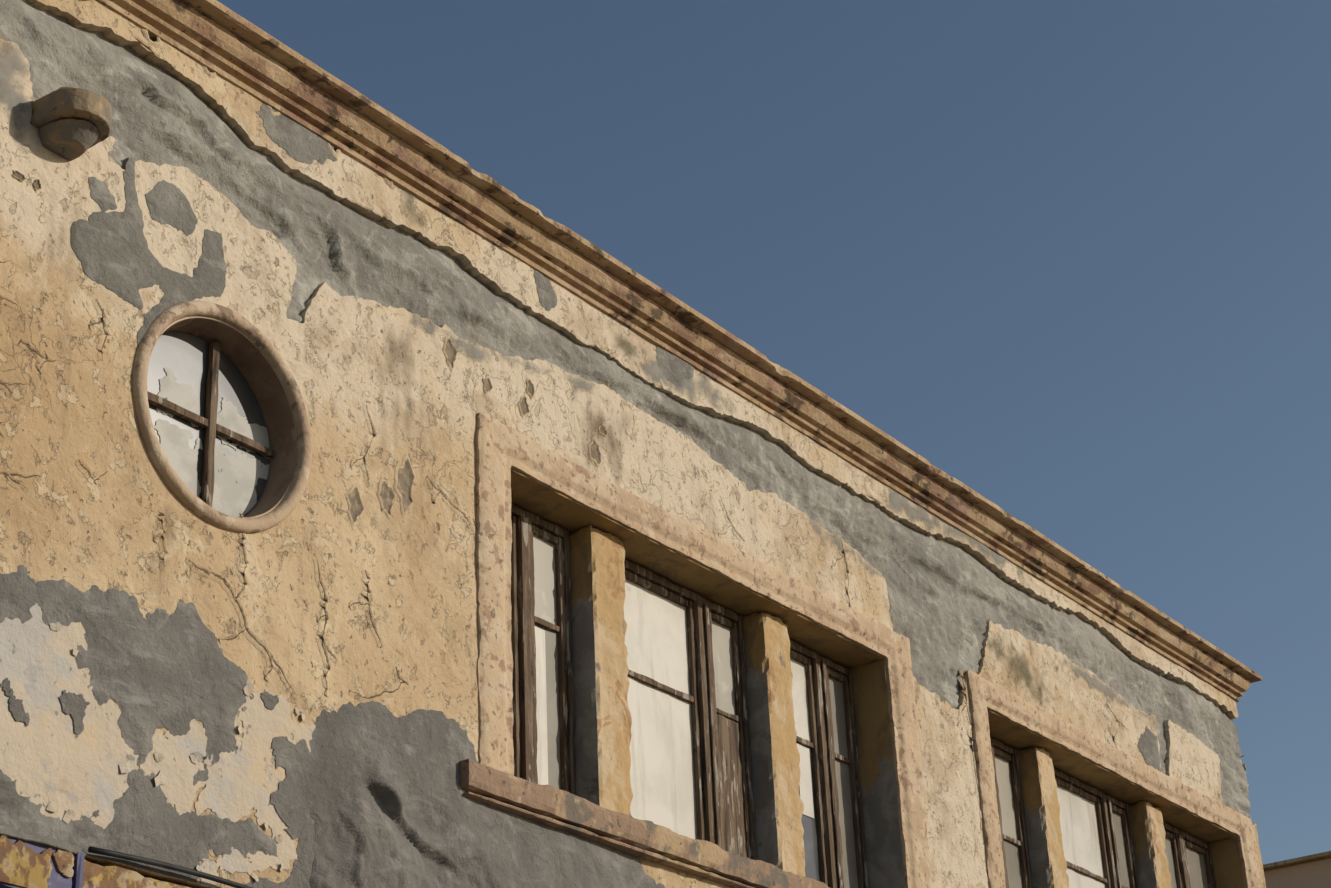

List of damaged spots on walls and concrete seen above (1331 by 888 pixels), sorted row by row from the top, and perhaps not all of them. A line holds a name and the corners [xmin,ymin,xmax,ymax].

spalling [11,170,42,192]
crack [0,259,57,490]
crack [89,298,113,360]
spalling [442,336,457,372]
spalling [518,378,534,418]
crack [75,460,110,485]
peeling [154,368,270,517]
spalling [345,483,364,527]
crack [350,404,378,488]
spalling [376,453,415,519]
crack [152,512,409,703]
peeling [0,603,318,888]